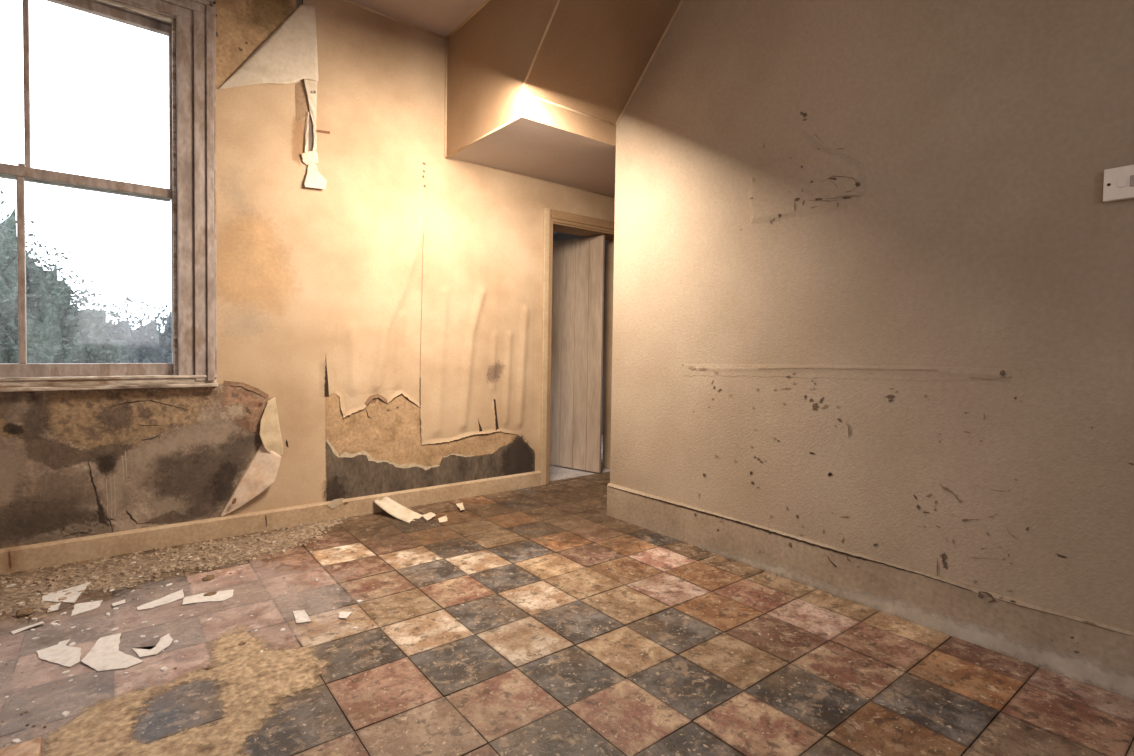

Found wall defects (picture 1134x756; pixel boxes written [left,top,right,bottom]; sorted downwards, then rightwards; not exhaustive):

flaking render [215,0,297,88]
damp [0,391,132,545]
flaking render [0,381,269,549]
damp [154,432,260,520]
flaking render [326,389,535,509]
damp [699,546,1134,699]